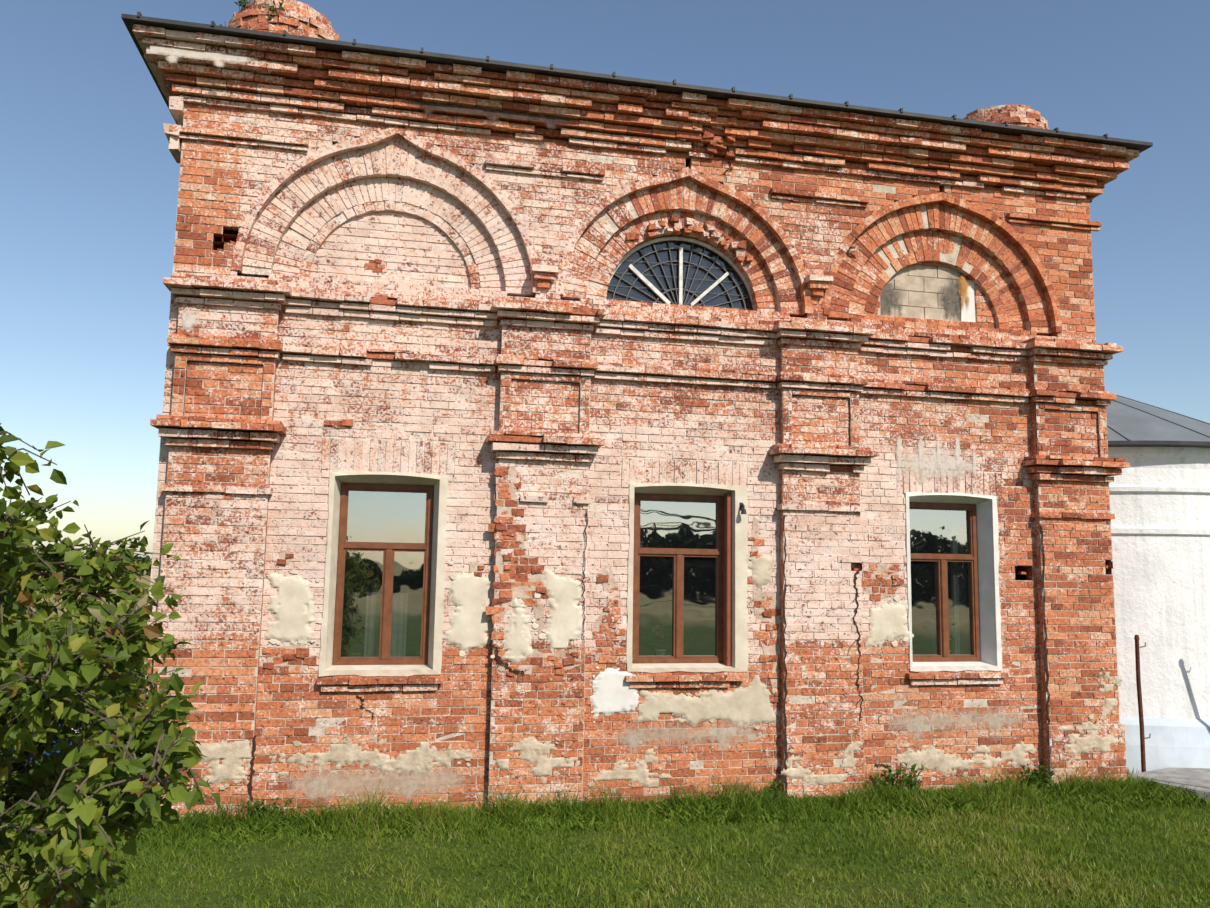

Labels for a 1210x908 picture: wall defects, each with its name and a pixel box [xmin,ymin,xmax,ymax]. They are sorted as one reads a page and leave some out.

spalling [212,234,238,251]
flaking render [262,549,323,674]
spalling [433,463,781,730]
flaking render [851,563,914,647]
crack [493,644,524,675]
crack [847,570,864,721]
flaking render [197,739,252,790]
flaking render [269,734,473,778]
flaking render [496,737,580,785]
flaking render [587,740,674,794]